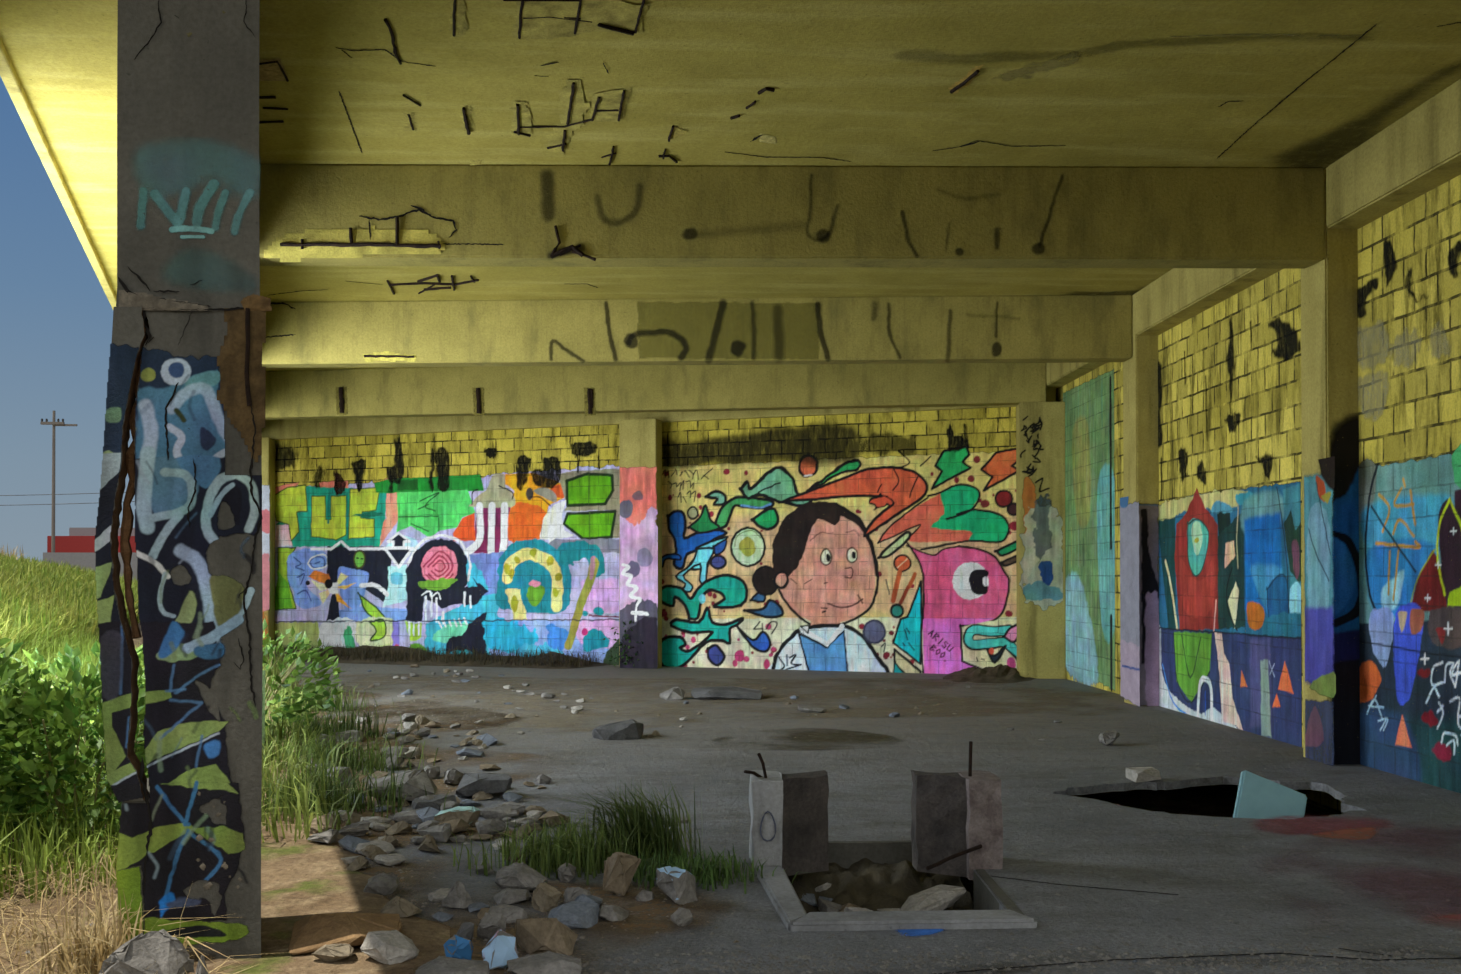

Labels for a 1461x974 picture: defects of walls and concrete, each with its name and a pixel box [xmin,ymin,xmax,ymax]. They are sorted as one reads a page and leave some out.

crack [134,0,162,60]
spalling [118,267,272,468]
crack [934,948,1461,974]